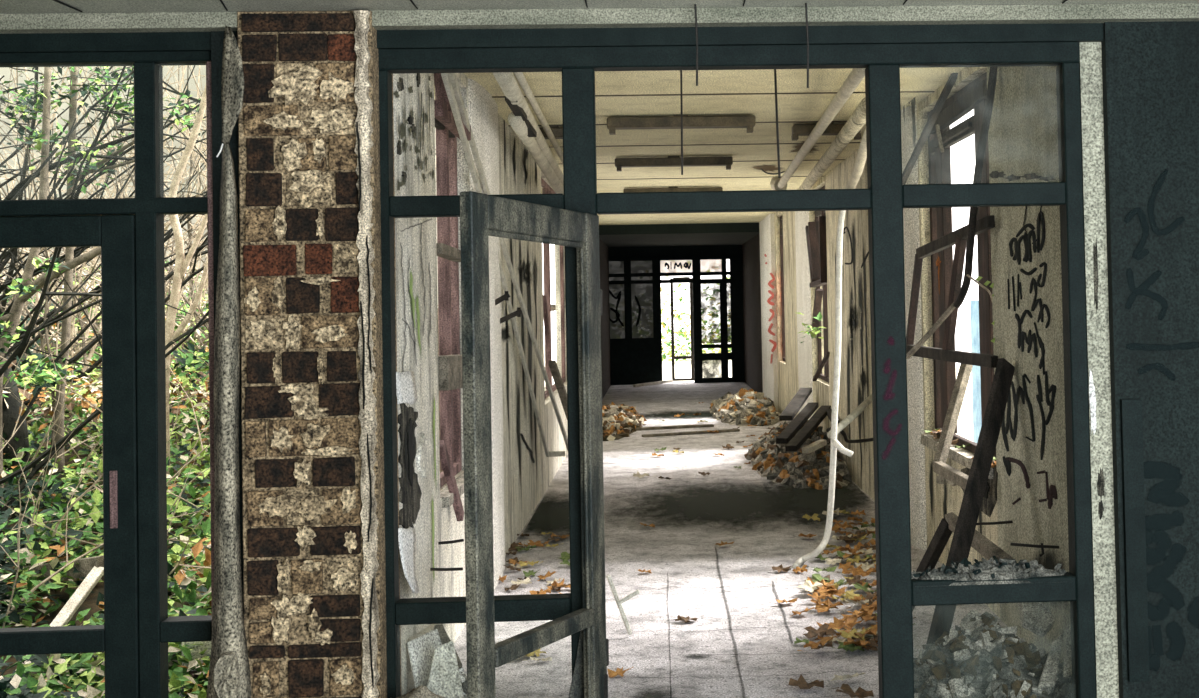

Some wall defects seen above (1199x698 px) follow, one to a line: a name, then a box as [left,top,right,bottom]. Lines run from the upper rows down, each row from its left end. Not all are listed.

peeling [394,73,434,190]
peeling [244,10,380,698]
spalling [396,371,430,594]
crack [715,547,745,698]